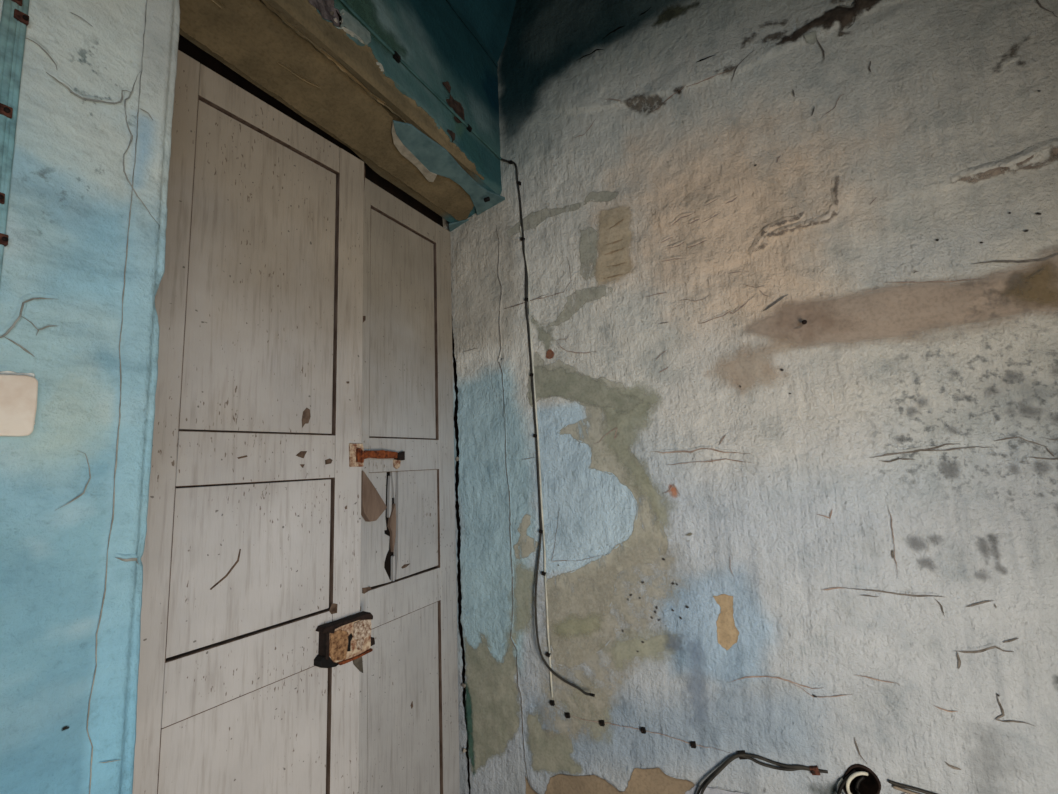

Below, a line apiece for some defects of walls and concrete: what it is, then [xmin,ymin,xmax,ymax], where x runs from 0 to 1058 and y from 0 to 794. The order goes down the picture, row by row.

flaking render [179,0,505,232]
flaking render [611,0,881,113]
leakage [720,251,1058,390]
crack [452,224,571,794]
peeling [465,191,673,774]
peeling [713,594,739,650]
leakage [980,536,1005,573]
flaking render [525,767,750,794]